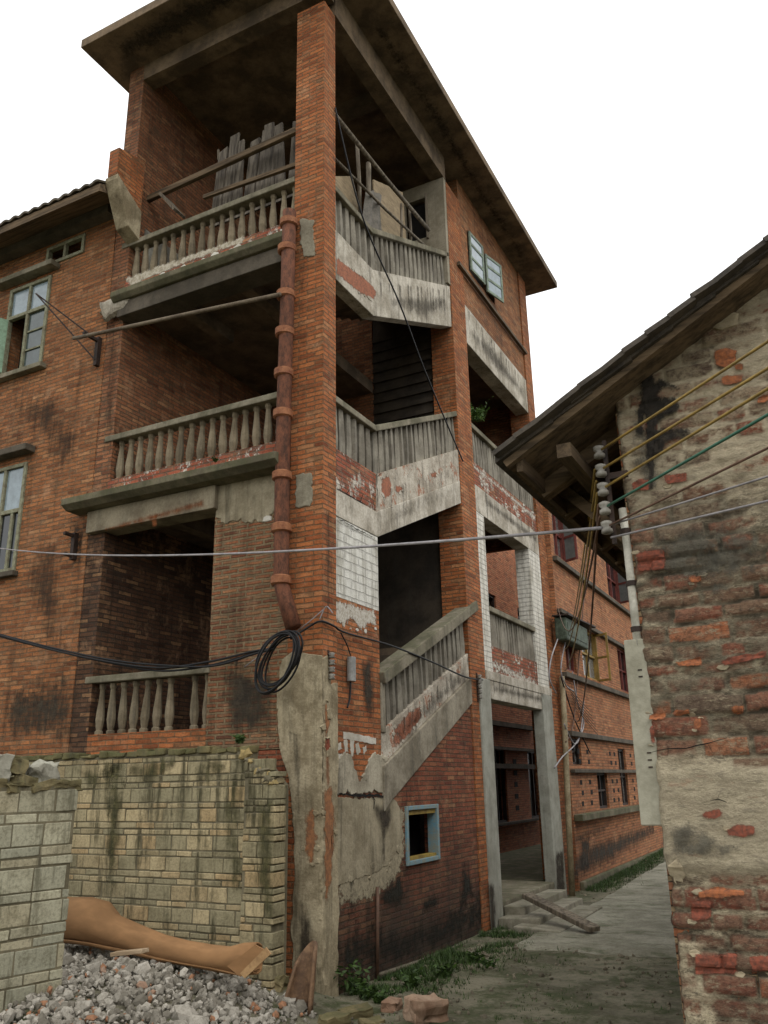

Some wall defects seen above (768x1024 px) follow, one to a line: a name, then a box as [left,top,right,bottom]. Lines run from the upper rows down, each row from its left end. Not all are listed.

peeling [337,259,376,301]
damp [636,401,655,489]
peeling [380,474,403,498]
peeling [474,466,536,520]
peeling [336,601,377,634]
spalling [687,886,744,924]
spalling [689,949,768,978]